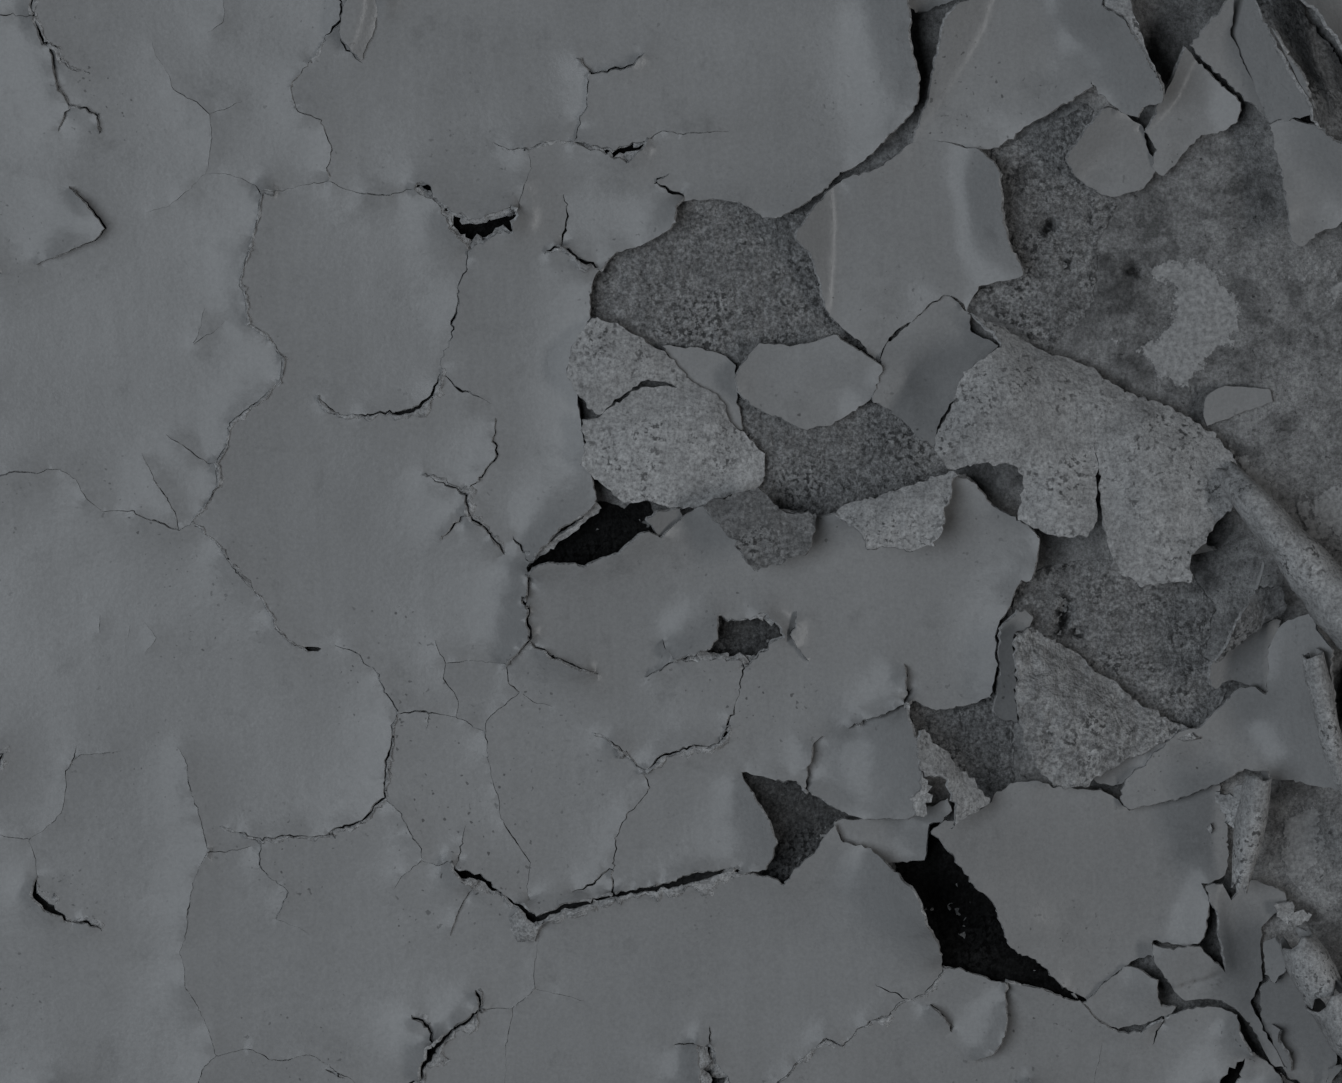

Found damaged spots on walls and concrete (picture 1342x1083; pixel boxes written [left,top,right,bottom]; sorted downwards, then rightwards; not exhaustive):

crack [4,0,100,133]
crack [544,199,599,273]
crack [654,176,684,196]
crack [131,180,321,652]
crack [316,368,479,422]
crack [421,431,576,667]
peeling [531,0,1342,1083]
crack [210,693,425,852]
crack [593,663,744,796]
crack [29,839,105,931]
crack [504,824,743,942]
crack [409,988,513,1083]